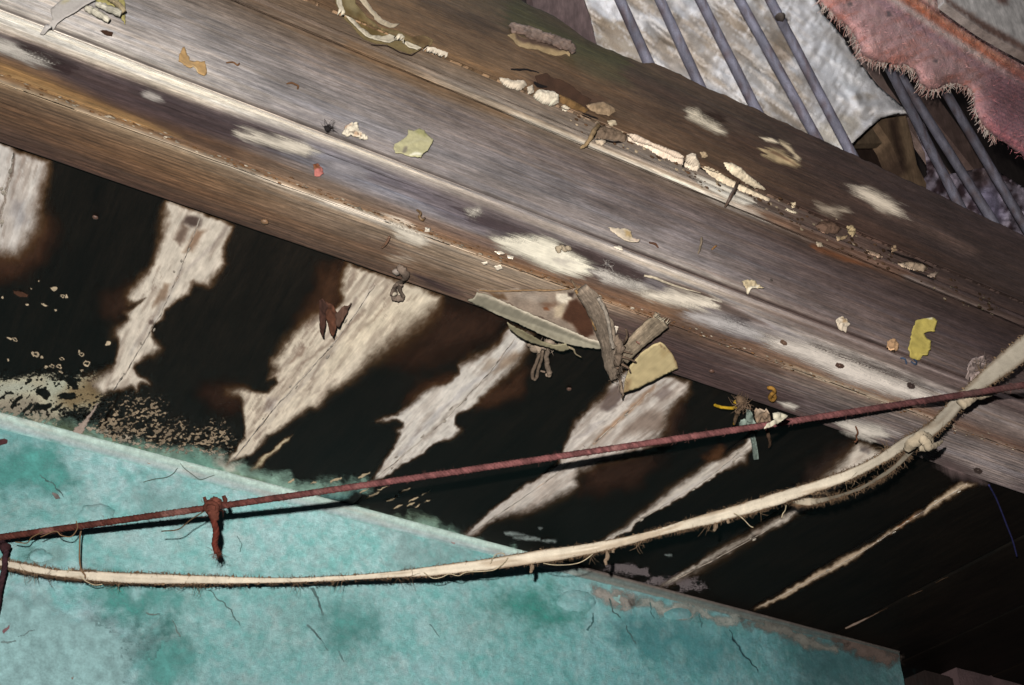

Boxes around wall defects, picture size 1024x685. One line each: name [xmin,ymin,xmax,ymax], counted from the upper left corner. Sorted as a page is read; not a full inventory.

damp [0,144,52,280]
damp [562,244,644,282]
spalling [500,68,1000,318]
damp [0,201,528,509]
damp [811,344,933,391]
damp [95,583,172,618]
damp [505,528,555,542]
damp [465,371,689,536]
damp [594,437,880,593]
damp [756,458,974,608]